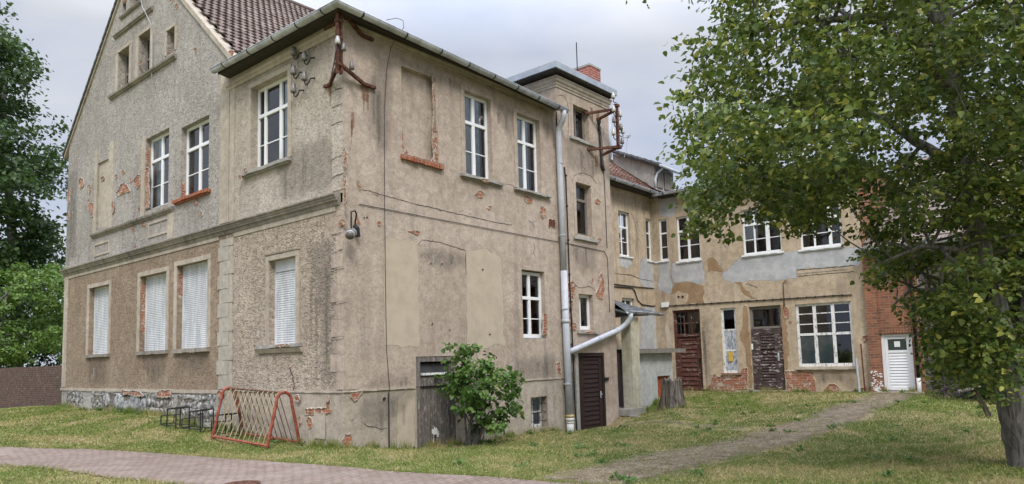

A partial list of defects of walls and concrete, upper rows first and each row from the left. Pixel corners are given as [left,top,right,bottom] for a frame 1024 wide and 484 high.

flaking render [67,146,151,247]
flaking render [568,281,596,334]
peeling [671,281,704,304]
flaking render [708,282,756,391]
flaking render [780,305,839,392]
flaking render [66,389,224,422]
flaking render [294,394,332,429]